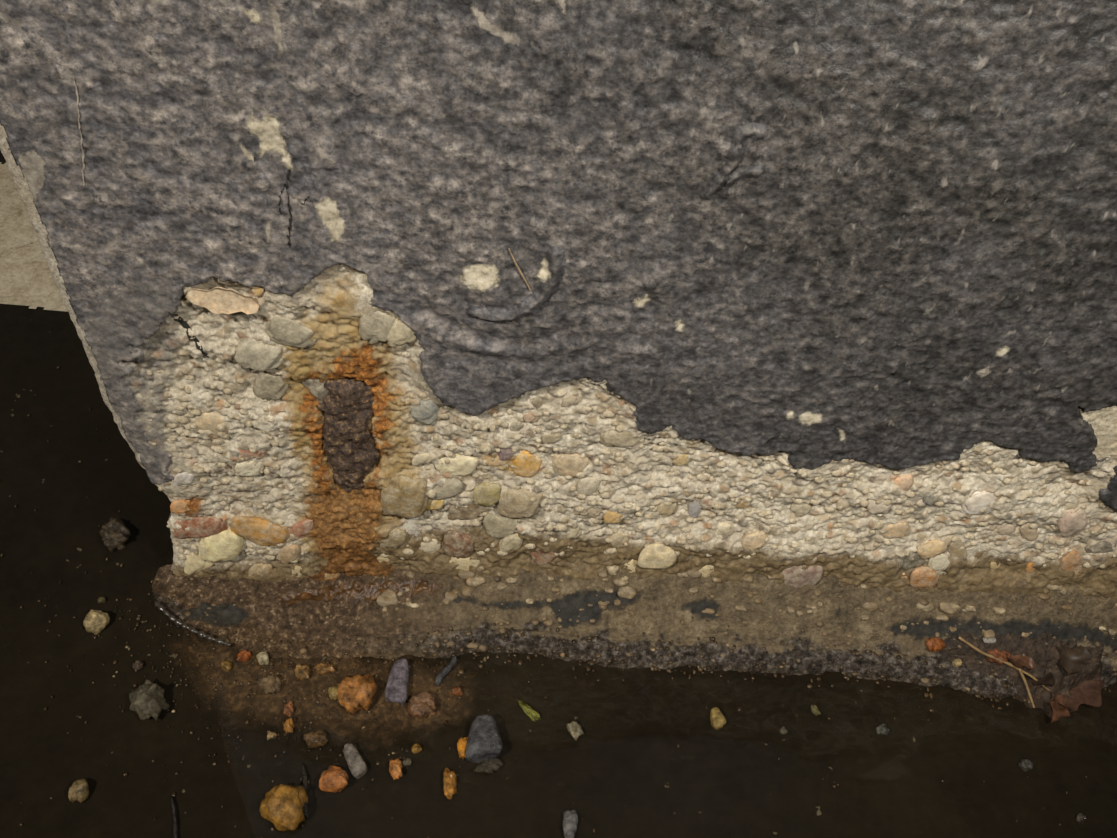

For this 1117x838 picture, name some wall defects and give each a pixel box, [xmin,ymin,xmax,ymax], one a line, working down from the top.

peeling [245,4,283,52]
peeling [473,7,517,45]
peeling [241,114,292,168]
spalling [0,124,1117,589]
rust [281,293,439,604]
damp [185,603,249,626]
damp [444,590,640,628]
damp [682,599,719,619]
damp [888,618,1117,651]